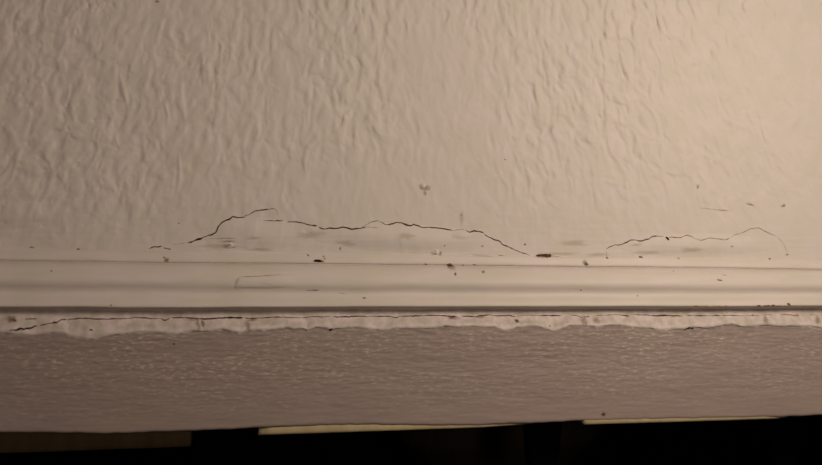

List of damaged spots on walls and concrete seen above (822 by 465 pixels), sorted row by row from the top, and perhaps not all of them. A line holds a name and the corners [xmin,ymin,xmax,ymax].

crack [149,208,528,255]
crack [606,227,787,256]